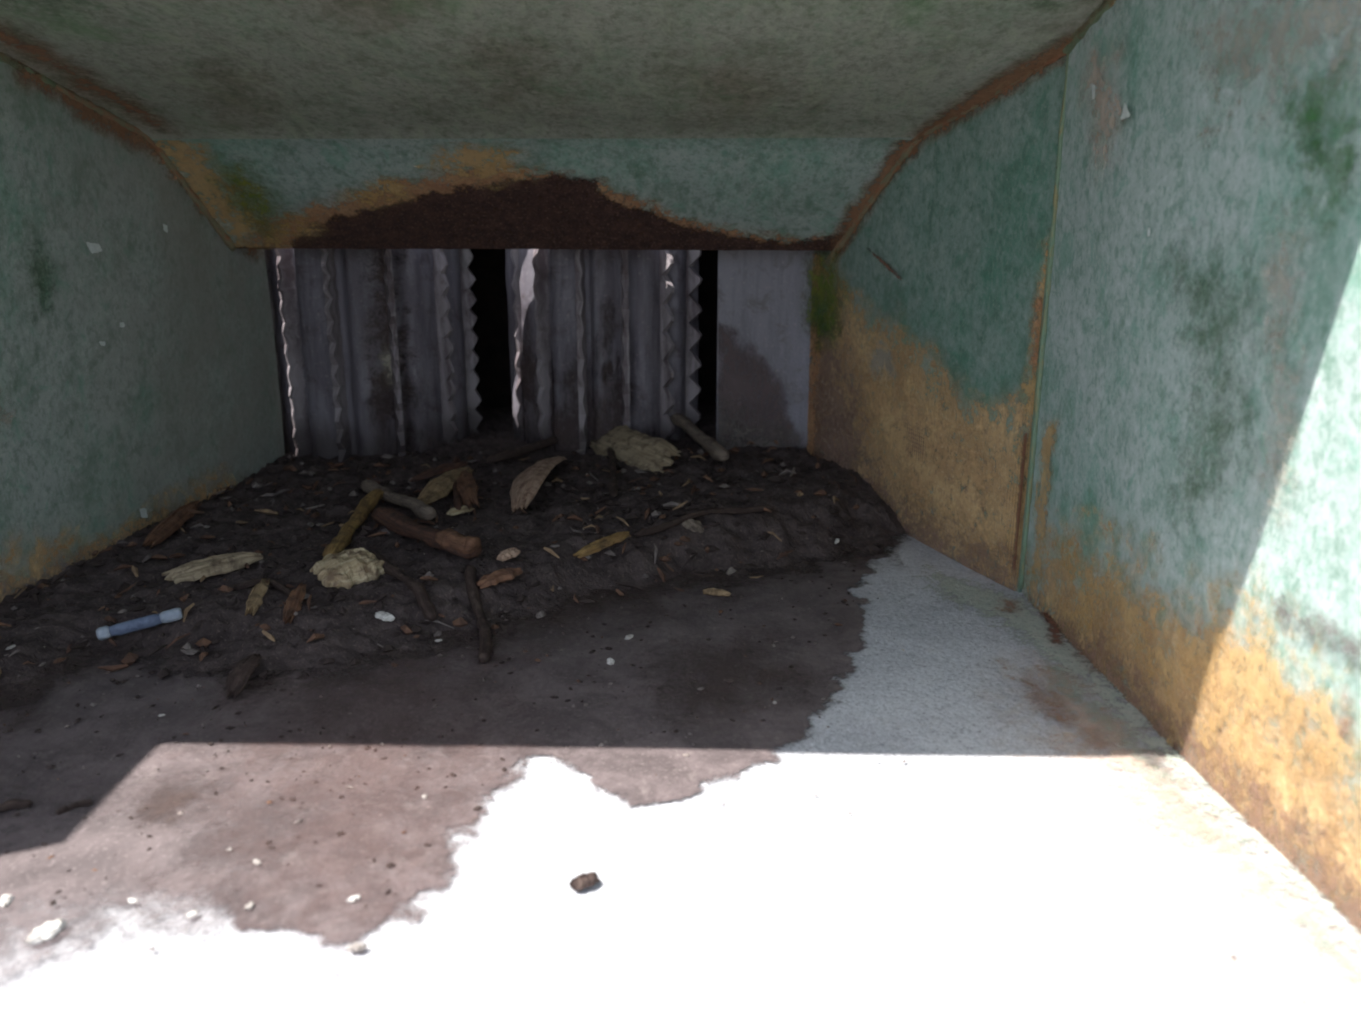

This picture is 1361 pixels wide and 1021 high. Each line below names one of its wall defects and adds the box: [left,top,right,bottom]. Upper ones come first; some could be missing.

rust [824,35,1074,262]
rust [0,492,169,603]
water stain [0,540,903,975]
rust [1006,243,1361,934]